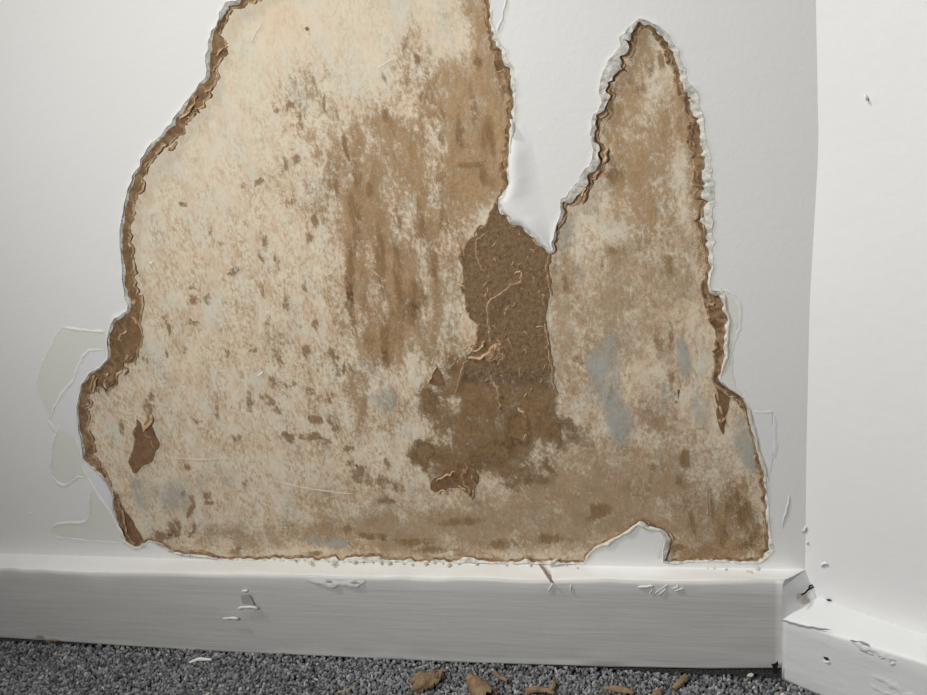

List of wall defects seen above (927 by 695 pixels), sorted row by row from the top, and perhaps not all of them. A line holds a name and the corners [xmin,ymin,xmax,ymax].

spalling [34,0,778,565]
water stain [205,0,766,559]
peeling [237,589,258,610]